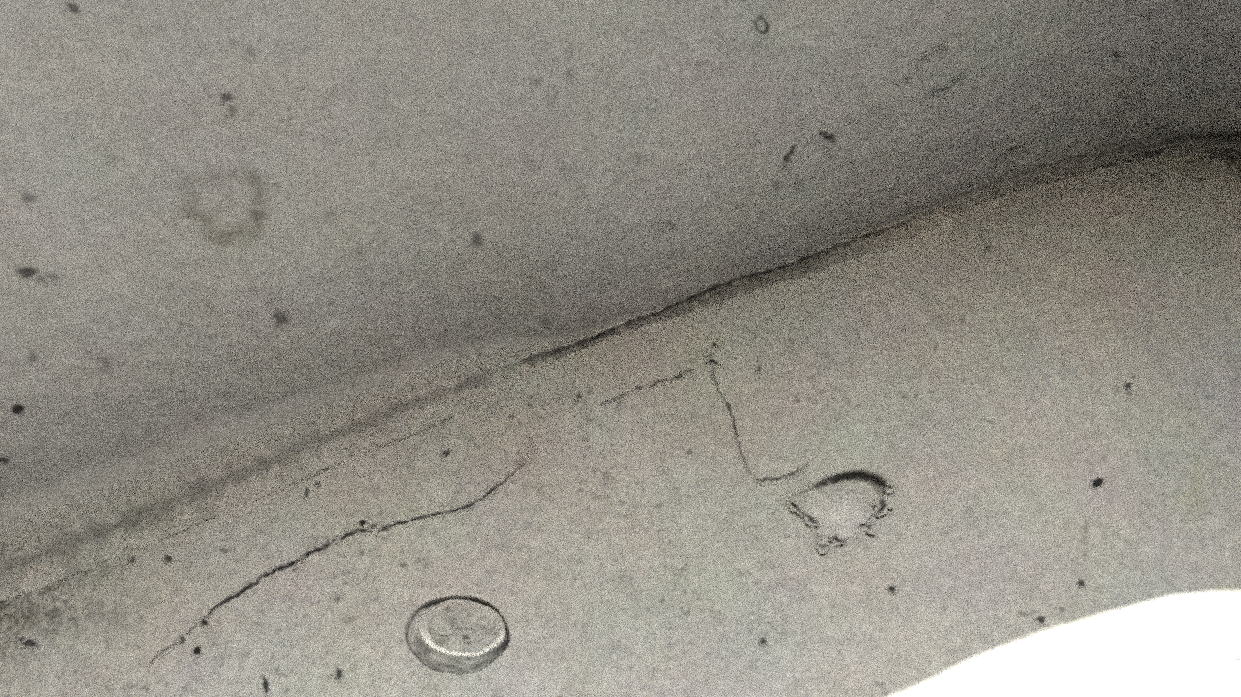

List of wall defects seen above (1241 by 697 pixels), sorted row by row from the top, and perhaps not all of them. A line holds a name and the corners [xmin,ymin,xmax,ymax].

crack [599,340,811,486]
crack [147,442,538,667]
peeling [778,465,897,556]